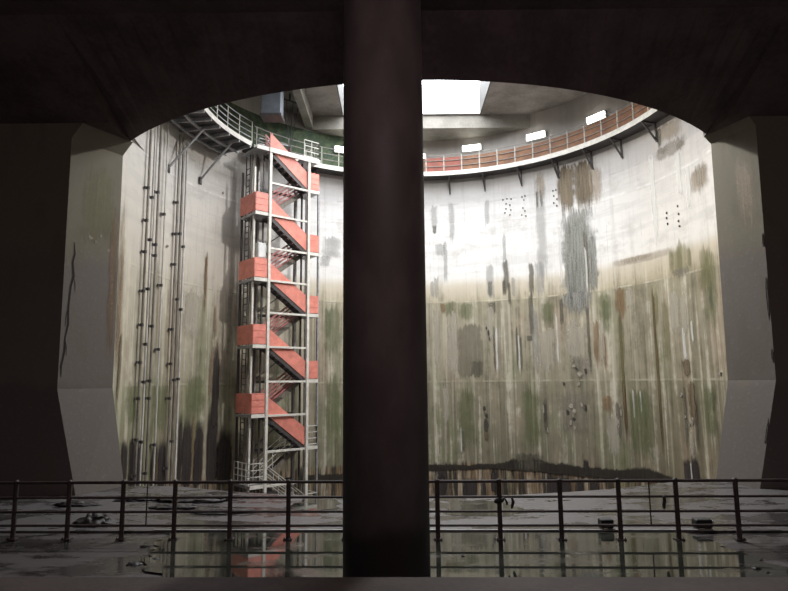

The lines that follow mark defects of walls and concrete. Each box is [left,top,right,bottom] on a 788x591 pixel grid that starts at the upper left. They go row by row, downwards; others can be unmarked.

crack [60,242,76,374]
leakage [177,350,232,487]
leakage [434,281,498,377]
leakage [429,453,672,496]
leakage [516,159,600,372]
corrosion [616,288,631,435]